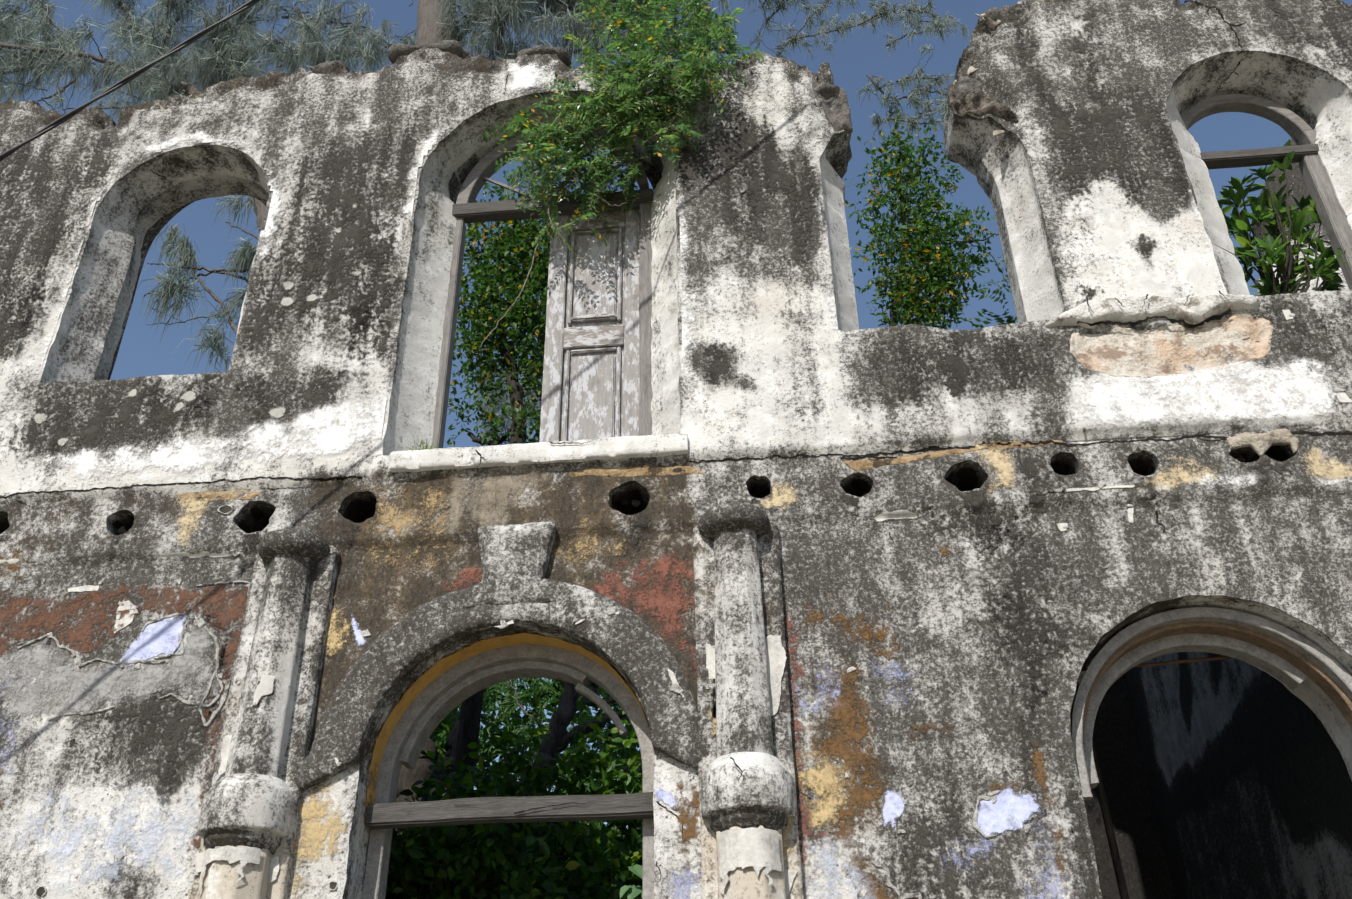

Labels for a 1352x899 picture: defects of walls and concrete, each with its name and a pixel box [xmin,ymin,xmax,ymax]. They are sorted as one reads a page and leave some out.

leakage [1266,0,1352,68]
leakage [678,114,822,266]
leakage [1005,2,1209,246]
leakage [0,113,449,479]
spalling [1070,310,1295,378]
crack [0,476,362,507]
peeling [0,578,250,807]
peeling [252,674,276,706]
peeling [593,553,716,734]
leakage [918,444,1099,899]
peeling [191,826,279,894]
peeling [972,786,1039,838]